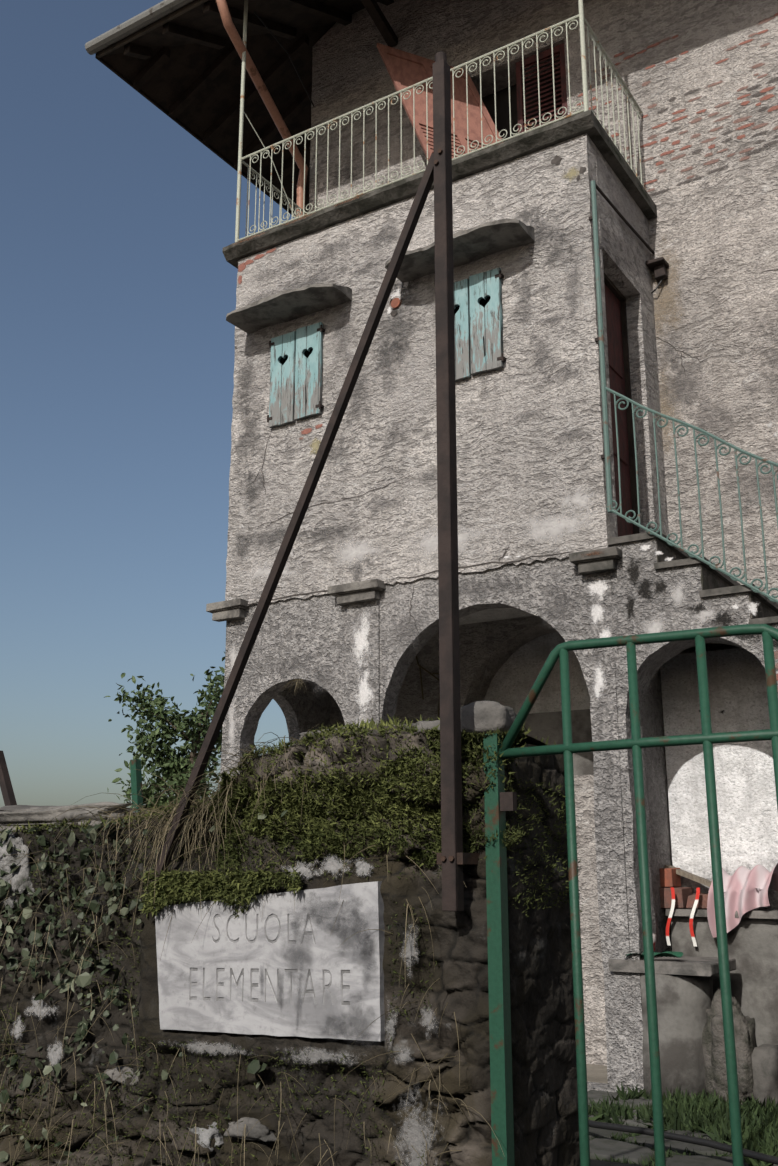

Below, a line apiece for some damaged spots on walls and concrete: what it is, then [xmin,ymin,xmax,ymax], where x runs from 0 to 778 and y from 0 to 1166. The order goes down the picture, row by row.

spalling [387,282,409,316]
crack [251,590,327,604]
crack [389,547,573,637]
peeling [588,576,611,638]
leakage [626,560,666,621]
peeling [353,612,374,724]
peeling [593,665,607,700]